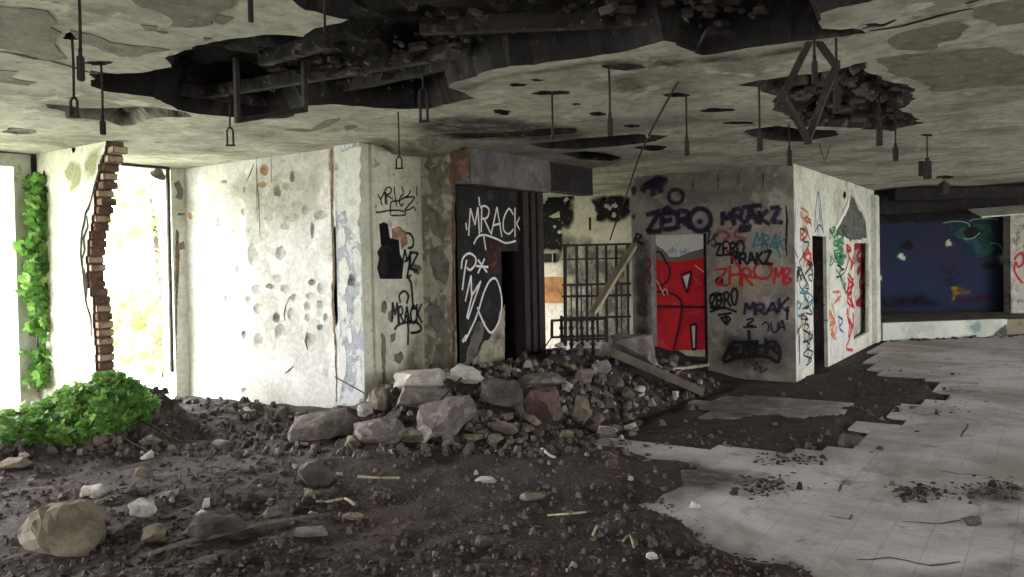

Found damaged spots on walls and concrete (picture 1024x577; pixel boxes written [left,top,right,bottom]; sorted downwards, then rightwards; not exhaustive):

spalling [0,0,1024,142]
spalling [88,146,128,372]
spalling [174,180,183,200]
spalling [175,229,185,359]
peeling [215,146,365,403]